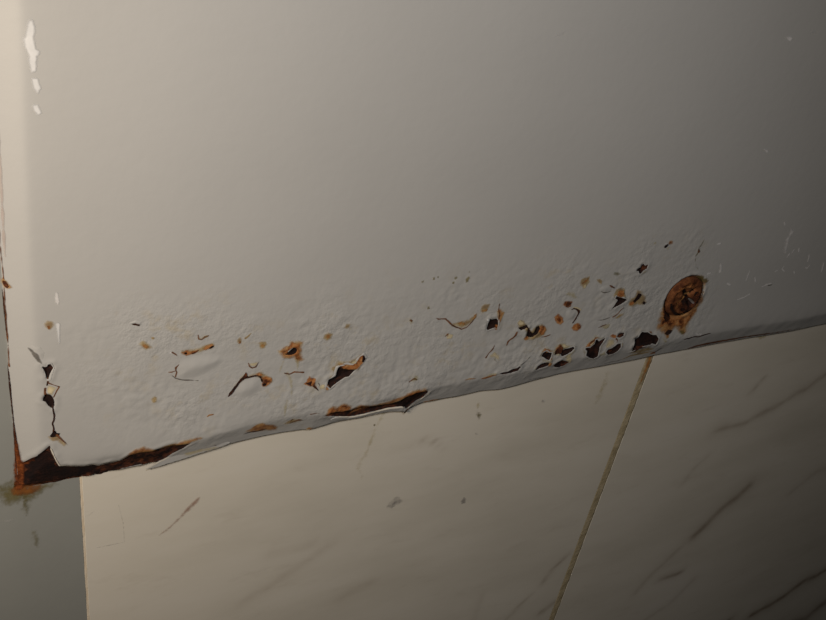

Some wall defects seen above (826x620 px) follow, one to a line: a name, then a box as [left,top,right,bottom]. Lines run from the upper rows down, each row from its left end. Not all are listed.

rust [657,295,702,338]
rust [279,342,302,361]
rust [284,371,325,391]
peeling [325,353,367,390]
rust [339,355,363,370]
rust [506,321,549,346]
peeling [541,331,660,361]